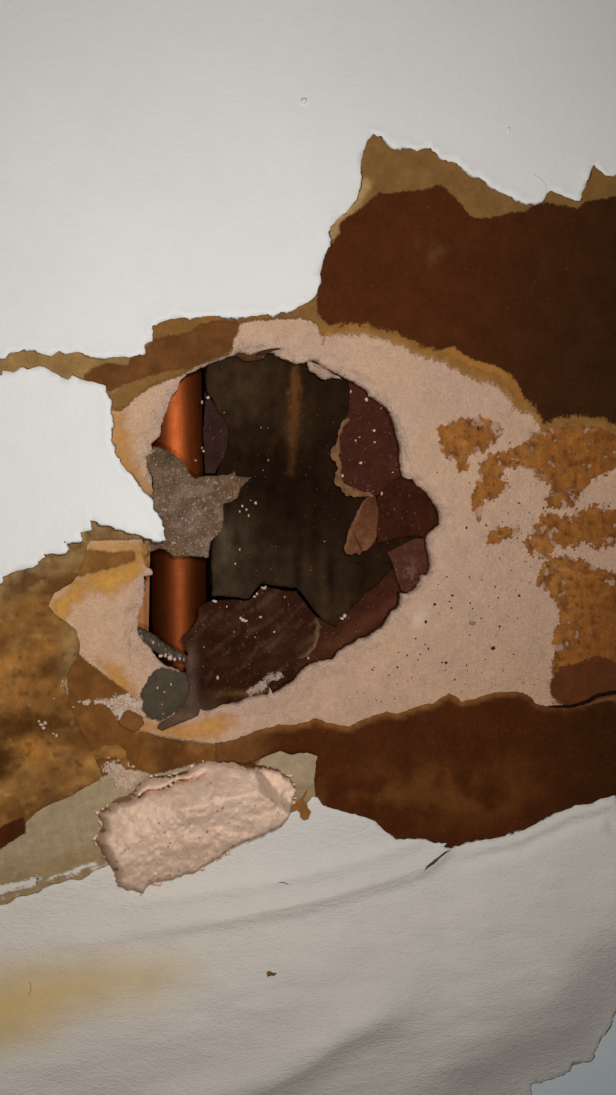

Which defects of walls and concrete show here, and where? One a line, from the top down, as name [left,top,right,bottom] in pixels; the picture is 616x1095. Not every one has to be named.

water stain [317,185,616,435]
spalling [49,317,616,743]
water stain [53,544,142,620]
water stain [550,655,616,705]
water stain [0,818,26,848]